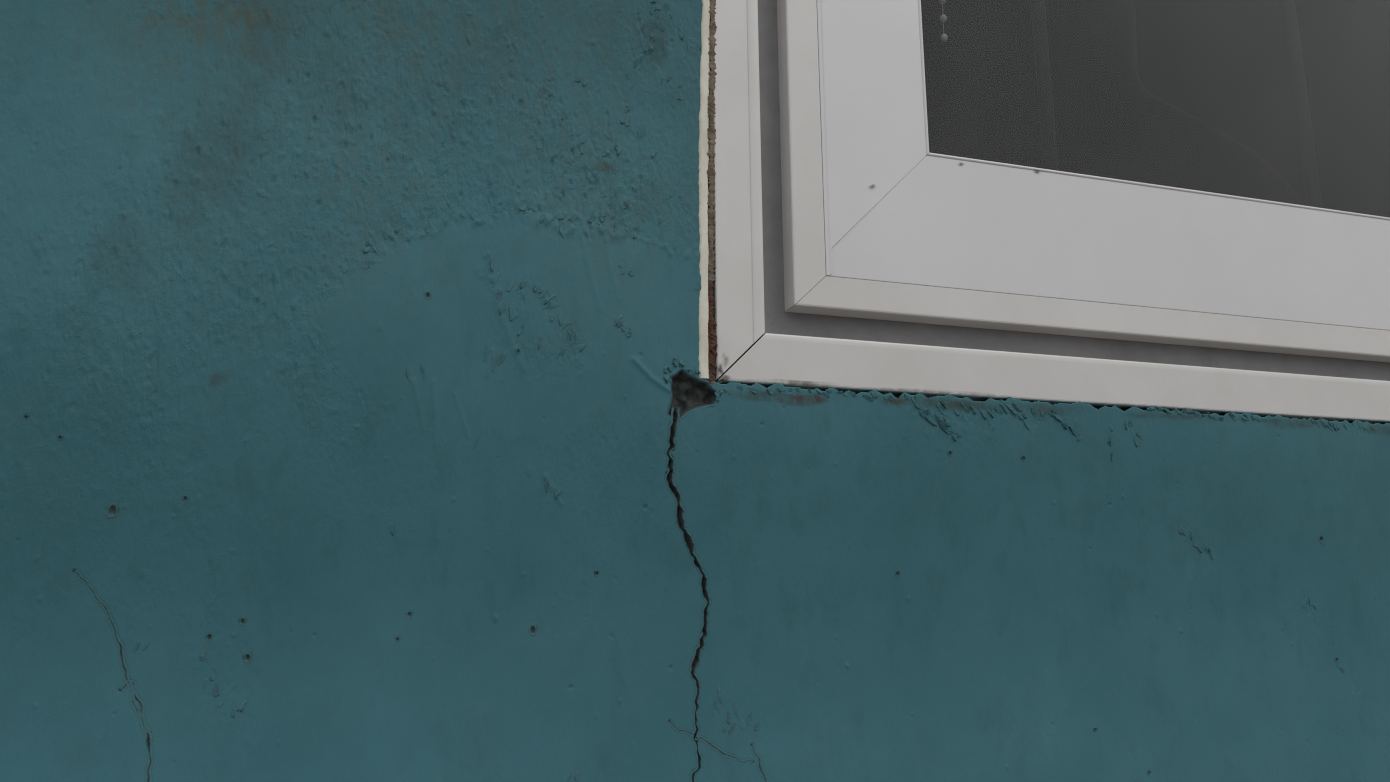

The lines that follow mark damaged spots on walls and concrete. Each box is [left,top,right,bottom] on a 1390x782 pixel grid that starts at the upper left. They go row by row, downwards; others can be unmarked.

flaking render [663,357,1081,457]
crack [664,408,768,782]